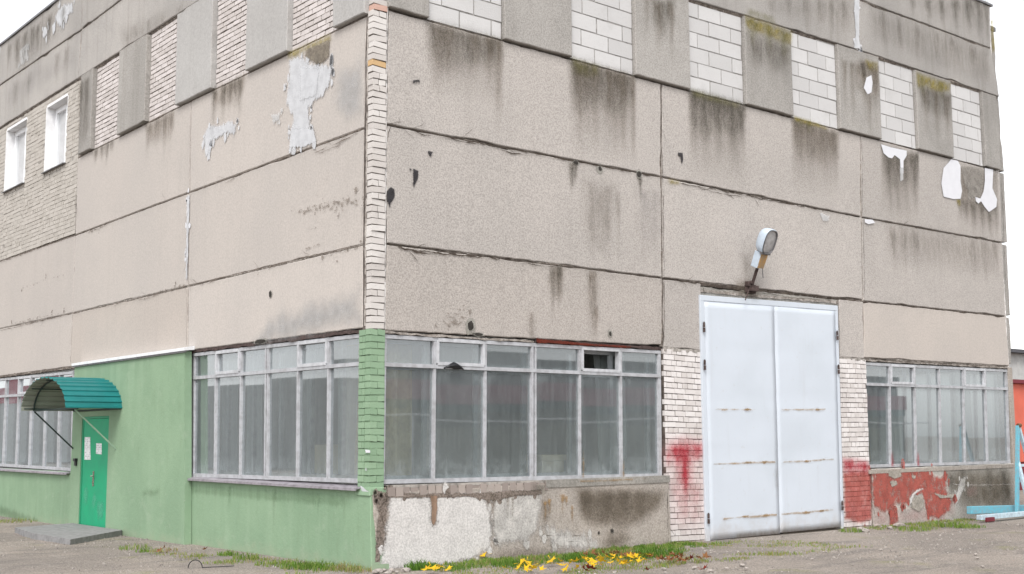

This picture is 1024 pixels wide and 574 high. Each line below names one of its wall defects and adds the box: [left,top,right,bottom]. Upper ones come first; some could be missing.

peeling [42,0,75,43]
peeling [271,53,335,155]
peeling [202,117,239,160]
leakage [962,166,997,219]
peeling [360,482,614,569]
leakage [578,491,661,546]
peeling [878,459,933,525]
peeling [931,463,969,504]